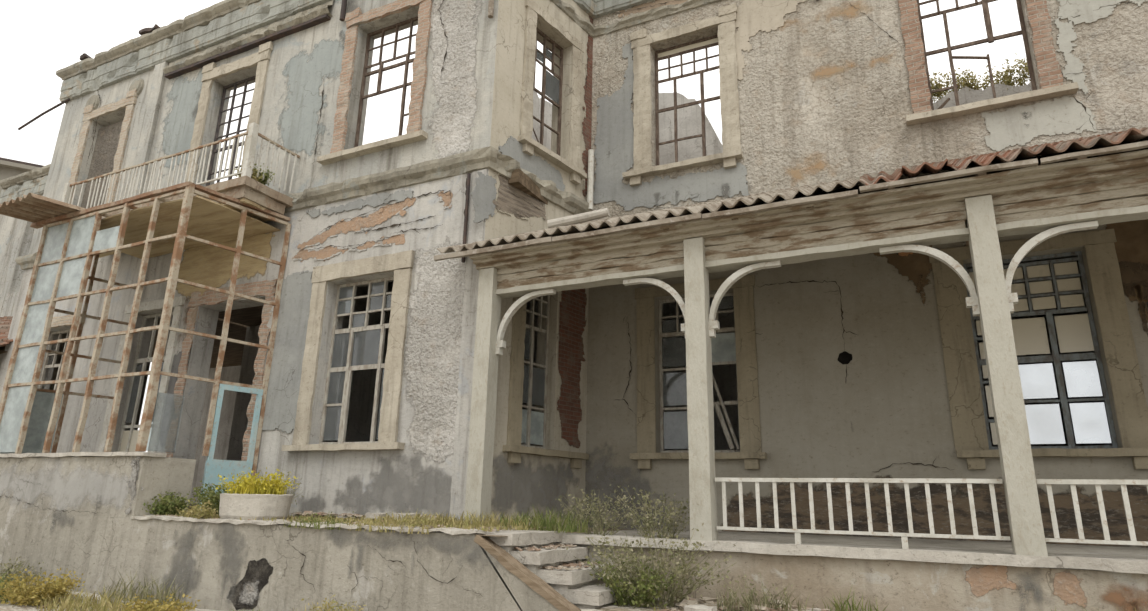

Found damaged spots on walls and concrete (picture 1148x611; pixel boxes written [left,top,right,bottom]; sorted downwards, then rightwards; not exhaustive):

crack [439,0,448,84]
flaking render [292,198,416,262]
flaking render [437,190,453,210]
flaking render [557,288,587,448]
crack [616,317,635,414]
crack [758,280,857,377]
flaking render [964,565,1018,597]